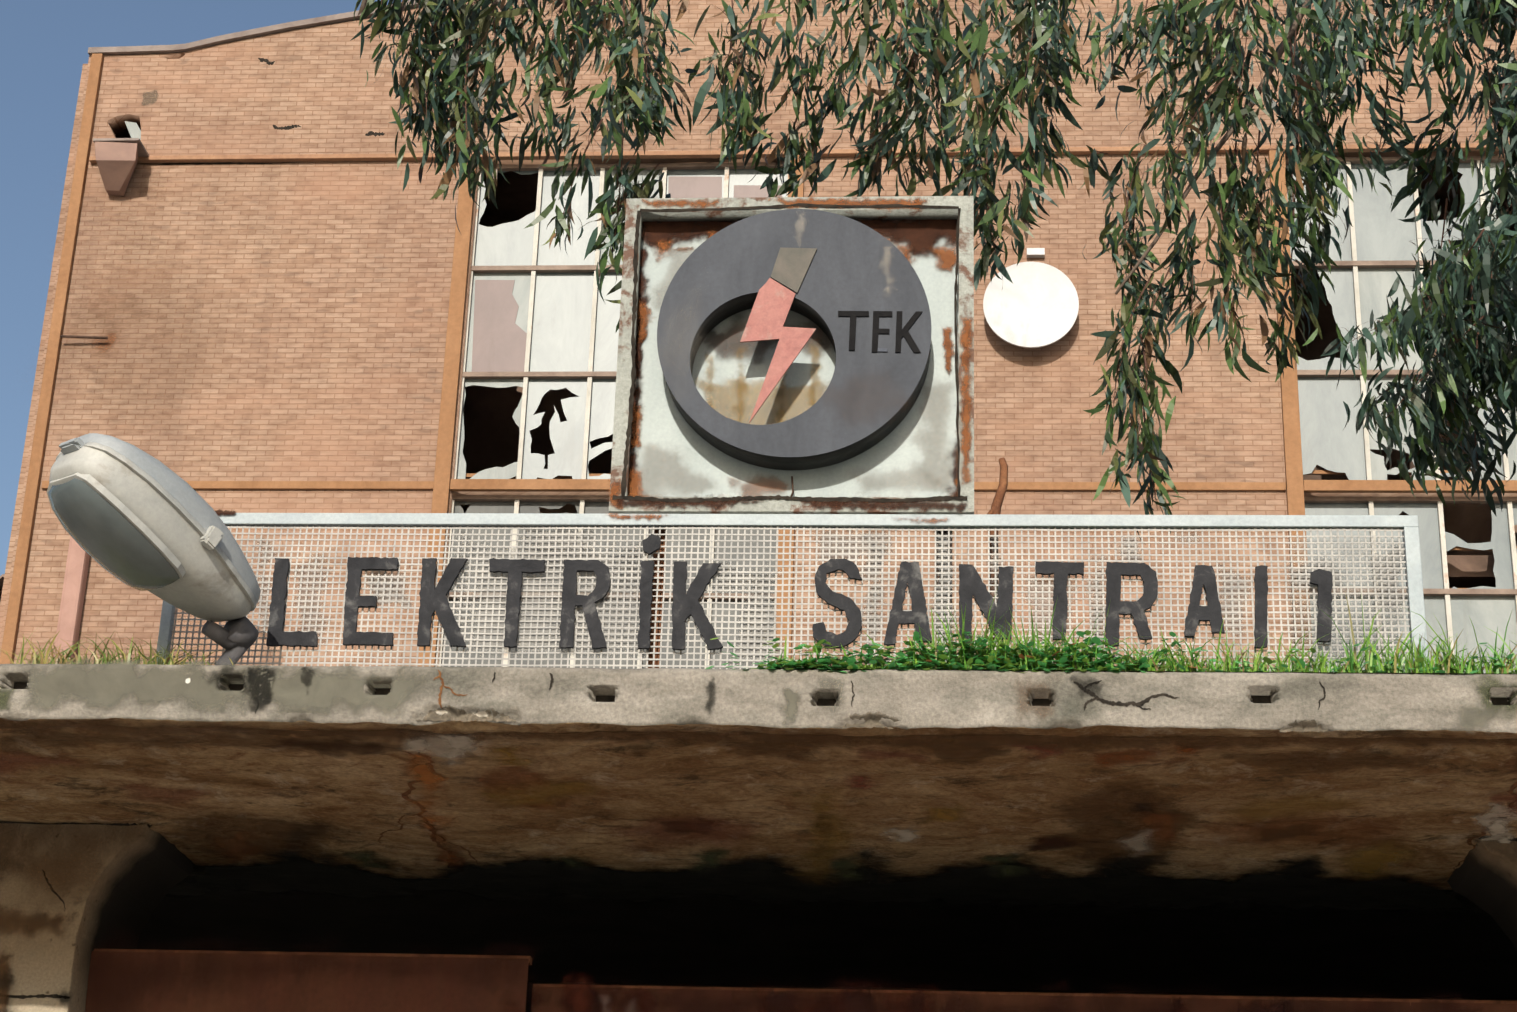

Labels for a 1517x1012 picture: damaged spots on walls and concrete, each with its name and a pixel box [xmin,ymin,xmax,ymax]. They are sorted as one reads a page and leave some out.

water stain [0,660,1517,772]
crack [1074,680,1178,710]
crack [378,747,478,869]
water stain [181,817,330,860]
crack [42,870,65,912]
corrosion [0,912,63,936]
corrosion [0,955,11,1012]